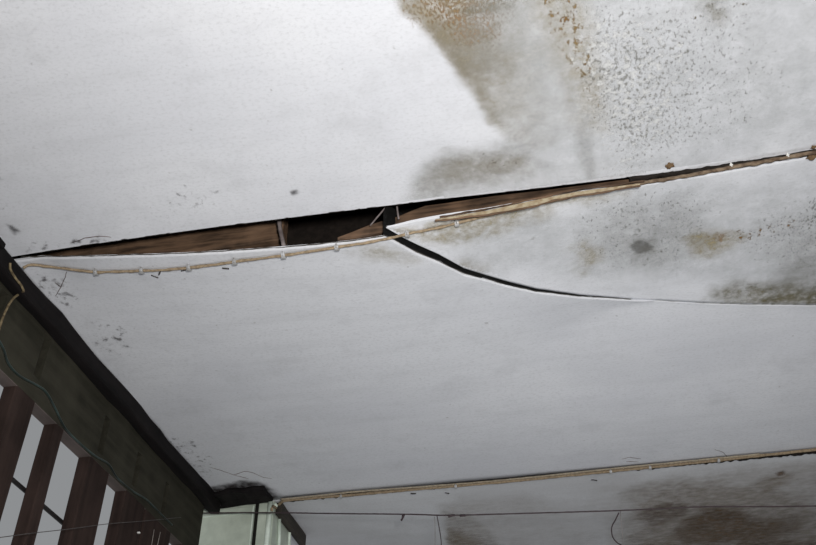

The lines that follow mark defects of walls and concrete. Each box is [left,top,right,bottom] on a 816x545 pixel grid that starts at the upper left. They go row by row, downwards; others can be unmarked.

leakage [403,0,513,107]
leakage [584,11,700,152]
crack [21,149,815,302]
leakage [724,285,816,304]